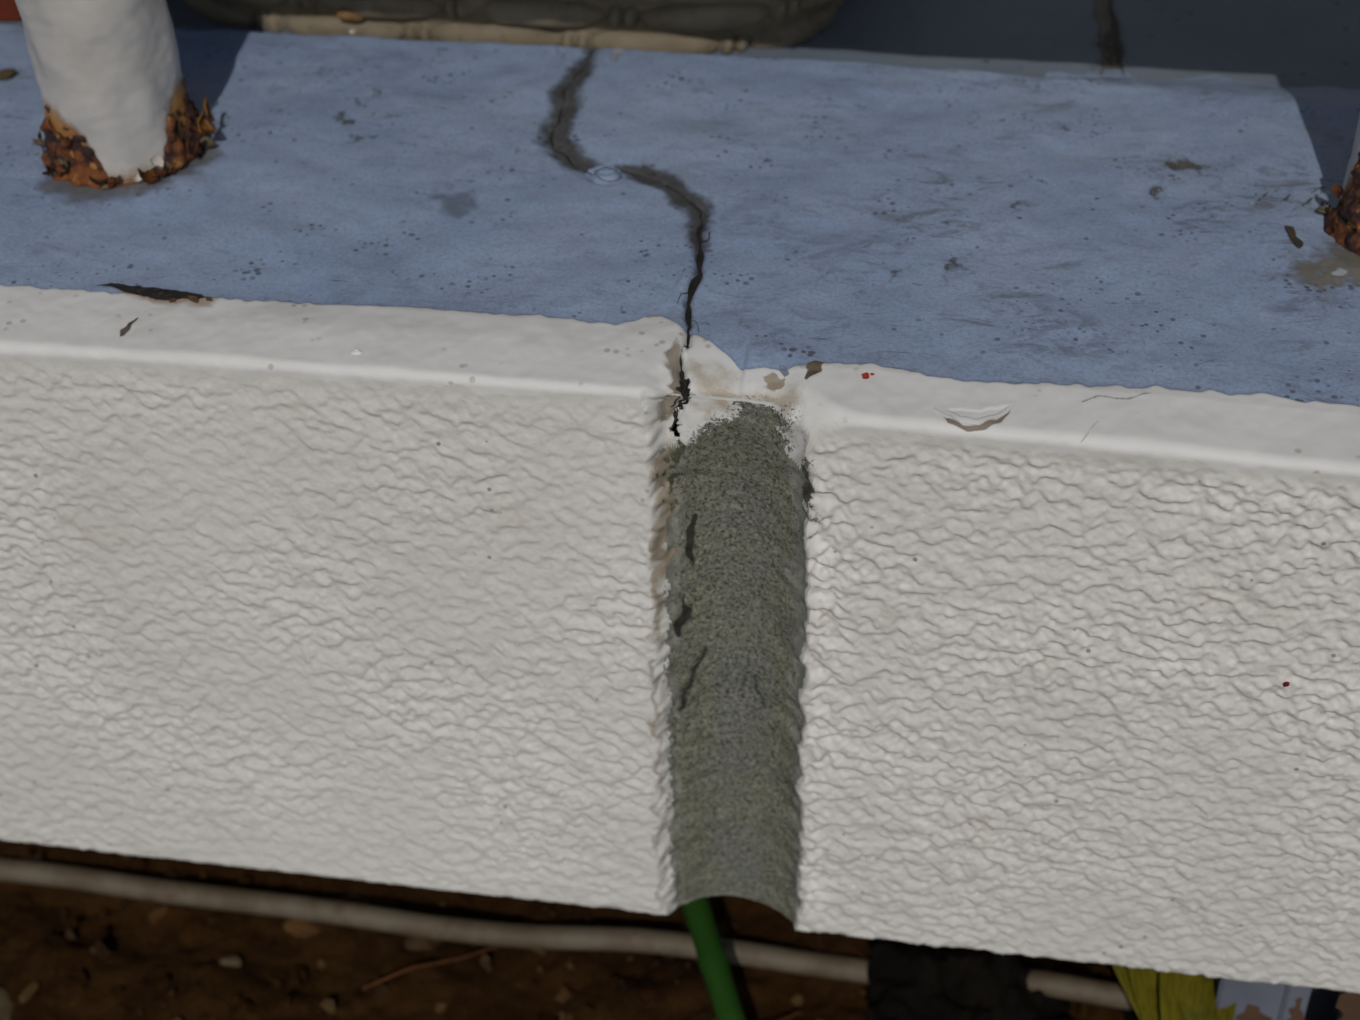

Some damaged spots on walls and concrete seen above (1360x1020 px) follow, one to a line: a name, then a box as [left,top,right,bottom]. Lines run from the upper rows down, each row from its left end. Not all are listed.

corrosion [32,78,217,189]
crack [550,50,710,430]
corrosion [1318,152,1360,256]
spalling [101,283,212,305]
peeling [935,401,1016,431]